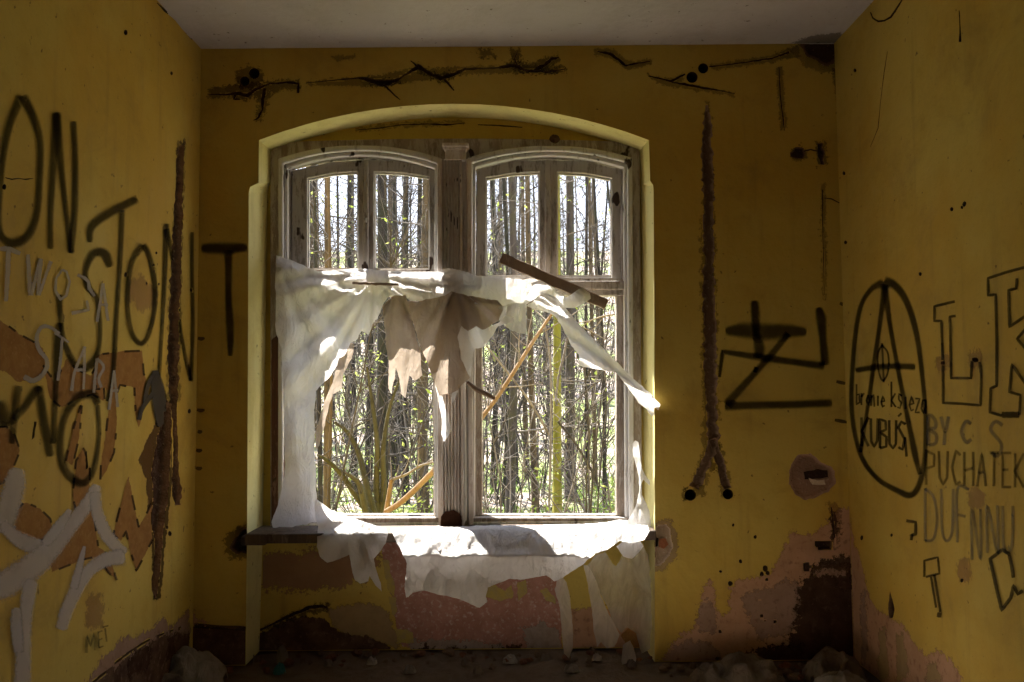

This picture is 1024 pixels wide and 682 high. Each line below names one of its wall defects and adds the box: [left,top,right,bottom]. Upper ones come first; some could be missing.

crack [207,47,566,130]
crack [597,51,789,131]
flaking render [789,453,836,500]
peeling [261,545,368,596]
peeling [329,542,645,649]
flaking render [654,518,679,572]
peeling [661,506,962,682]
peeling [84,609,191,682]